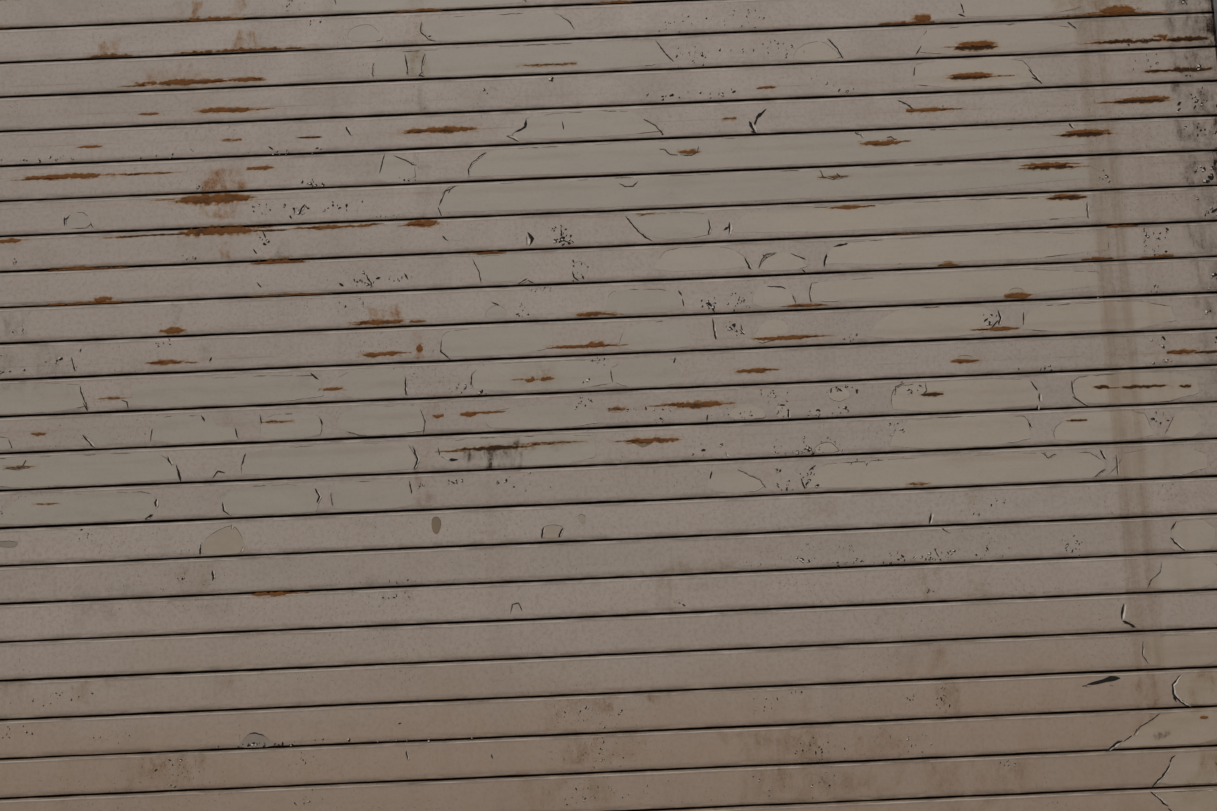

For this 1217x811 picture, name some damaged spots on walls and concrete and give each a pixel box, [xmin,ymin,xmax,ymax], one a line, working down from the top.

rust [1062,6,1162,17]
rust [956,41,996,51]
rust [163,194,250,205]
rust [447,441,574,452]